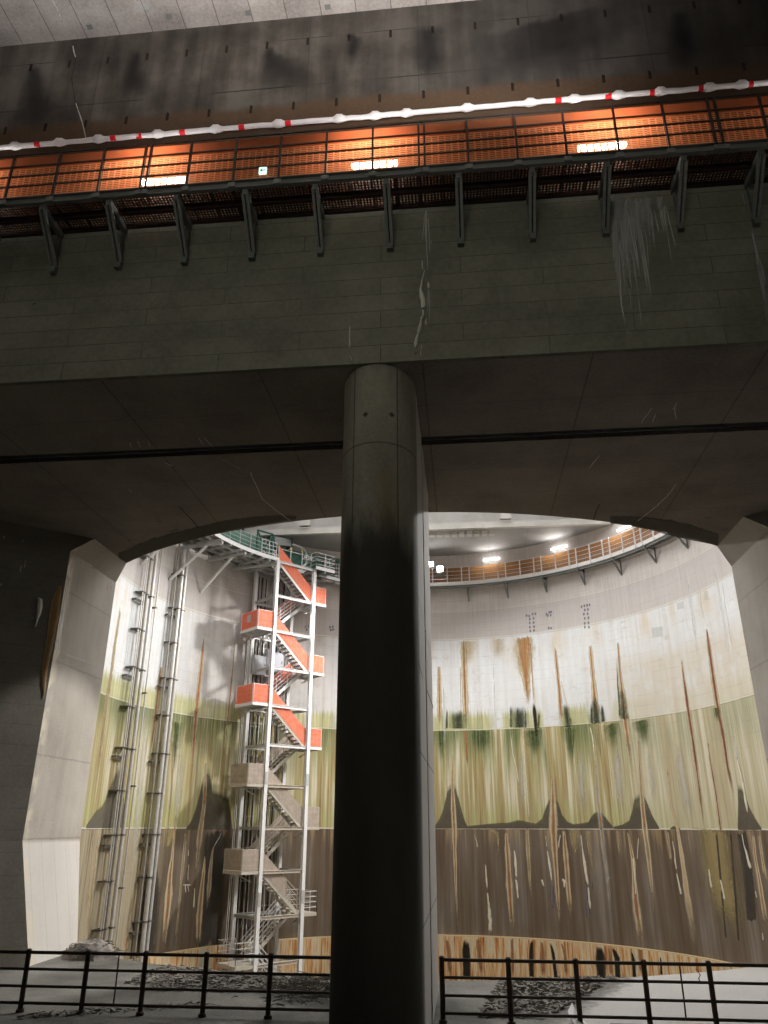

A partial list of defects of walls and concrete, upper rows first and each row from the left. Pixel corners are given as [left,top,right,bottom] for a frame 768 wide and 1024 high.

efflorescence [612,197,676,325]
rust [163,641,214,937]
rust [460,641,469,716]
rust [515,636,534,696]
rust [554,648,563,714]
leakage [435,674,682,917]
rust [589,646,599,711]
rust [616,644,653,930]
rust [681,629,730,832]
leakage [708,745,762,940]